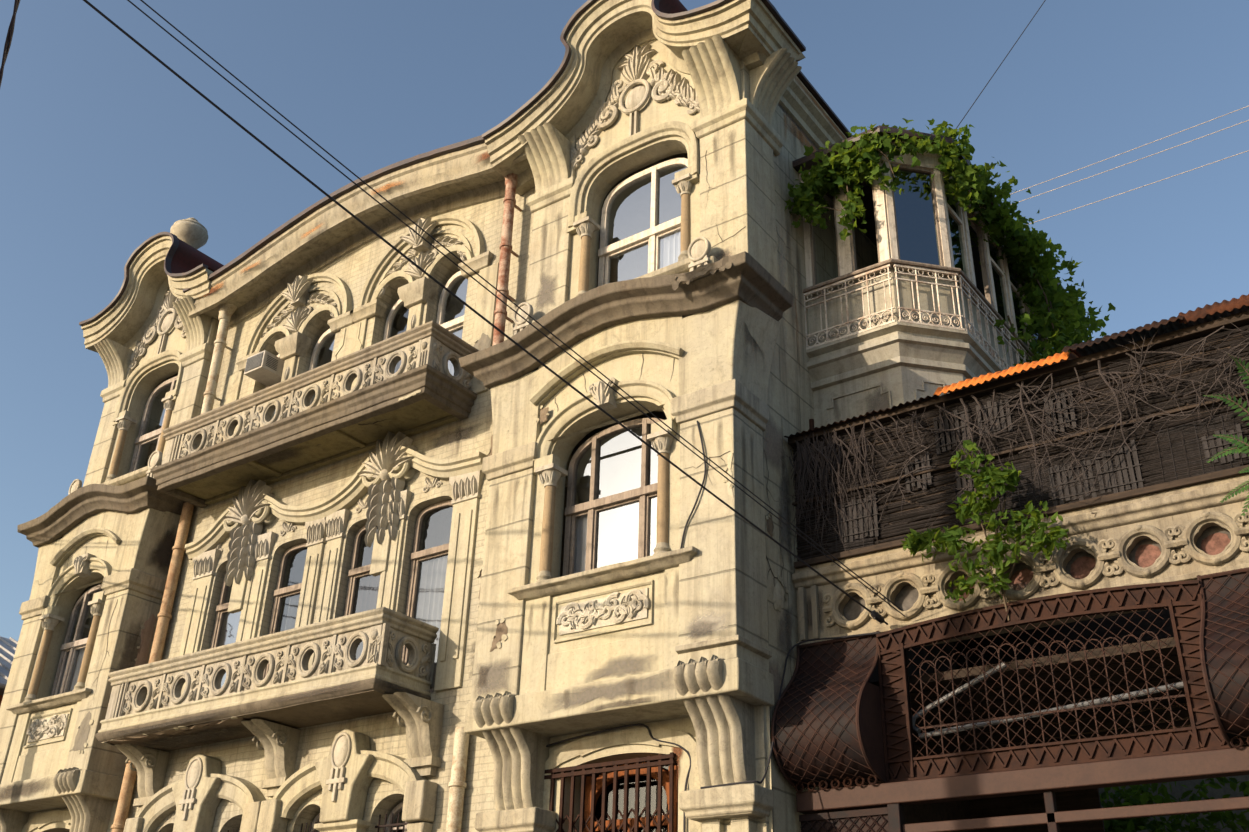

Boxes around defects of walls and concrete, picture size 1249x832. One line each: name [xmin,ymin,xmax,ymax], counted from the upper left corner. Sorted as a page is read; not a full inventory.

crack [705,150,746,248]
damp [152,531,176,569]
damp [119,632,139,670]
damp [559,658,663,711]